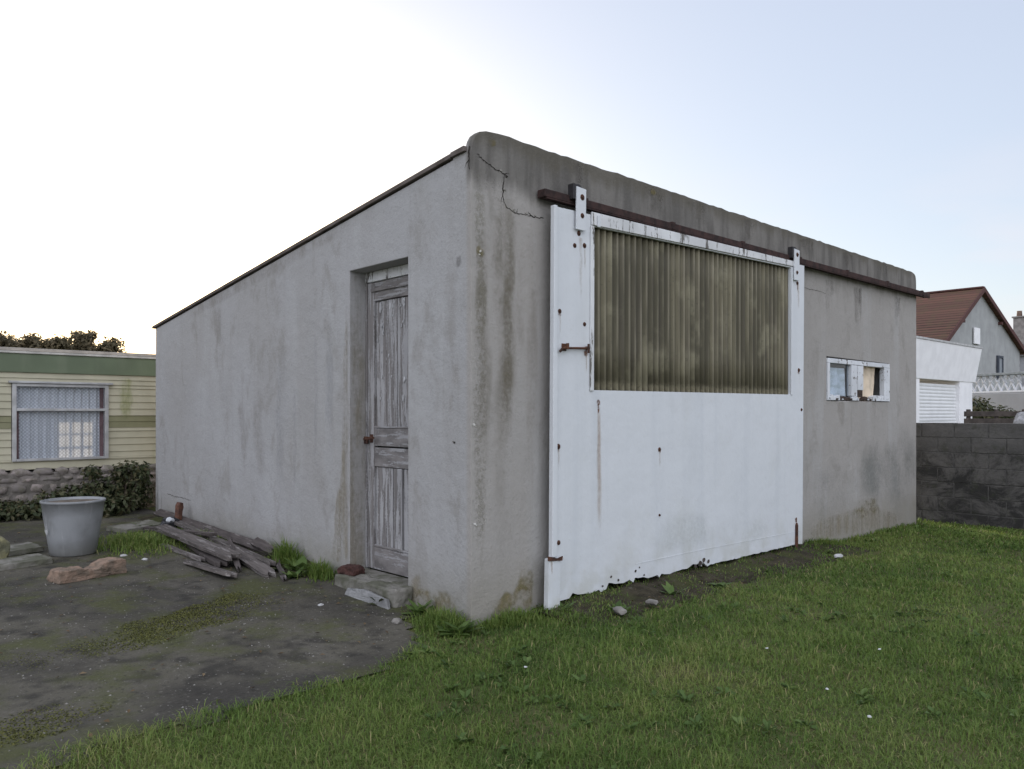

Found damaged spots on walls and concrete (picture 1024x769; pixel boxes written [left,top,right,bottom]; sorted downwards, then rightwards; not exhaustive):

crack [465,146,544,219]